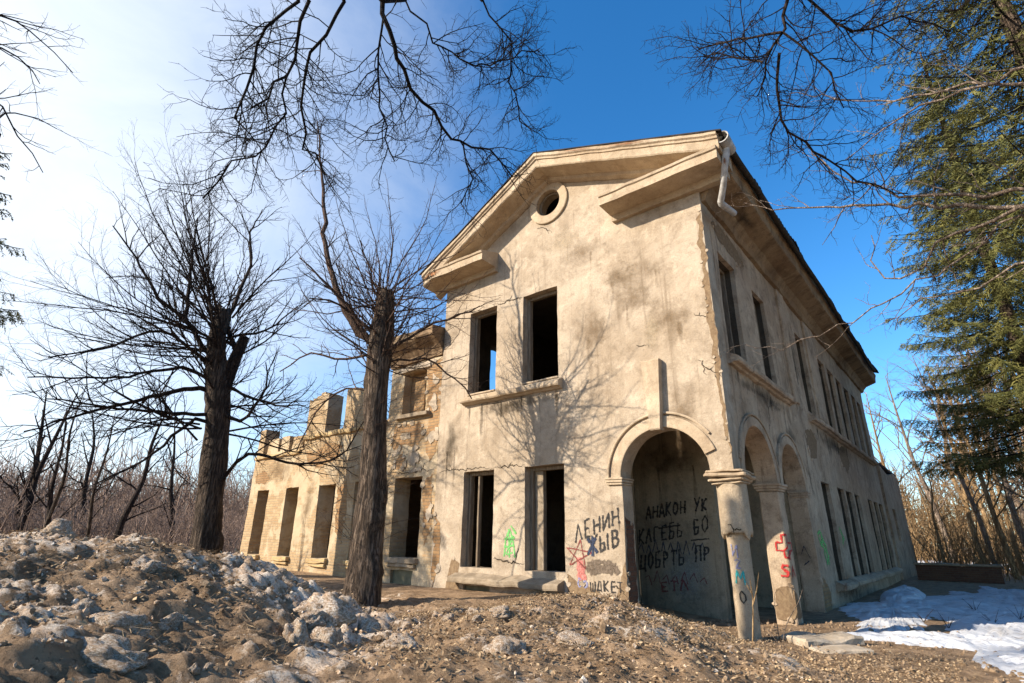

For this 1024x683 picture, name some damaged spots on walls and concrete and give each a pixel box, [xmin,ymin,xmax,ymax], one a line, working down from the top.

flaking render [696,209,744,456]
flaking render [390,358,443,472]
flaking render [420,474,459,589]